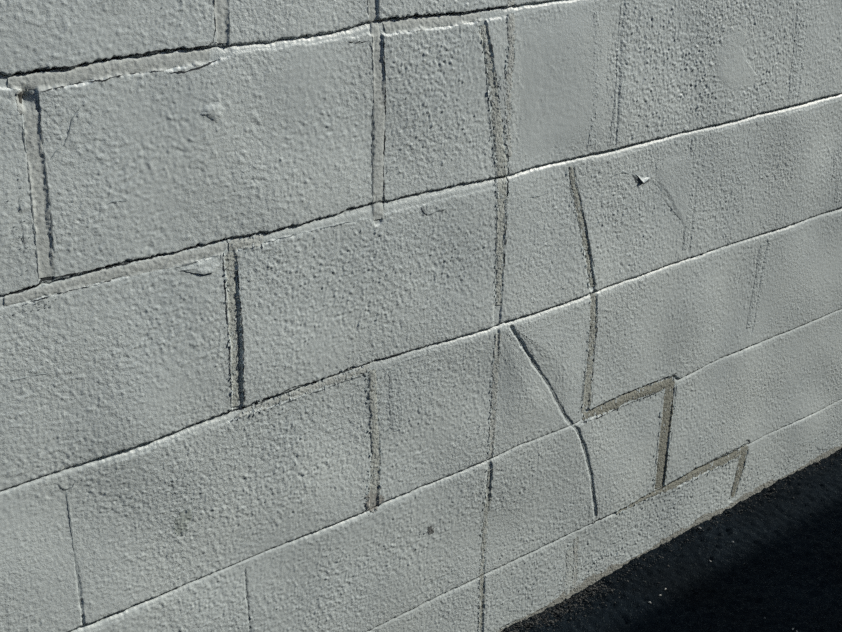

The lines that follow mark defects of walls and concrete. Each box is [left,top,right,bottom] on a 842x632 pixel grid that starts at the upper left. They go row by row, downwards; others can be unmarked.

crack [7,0,545,422]
crack [479,166,748,632]